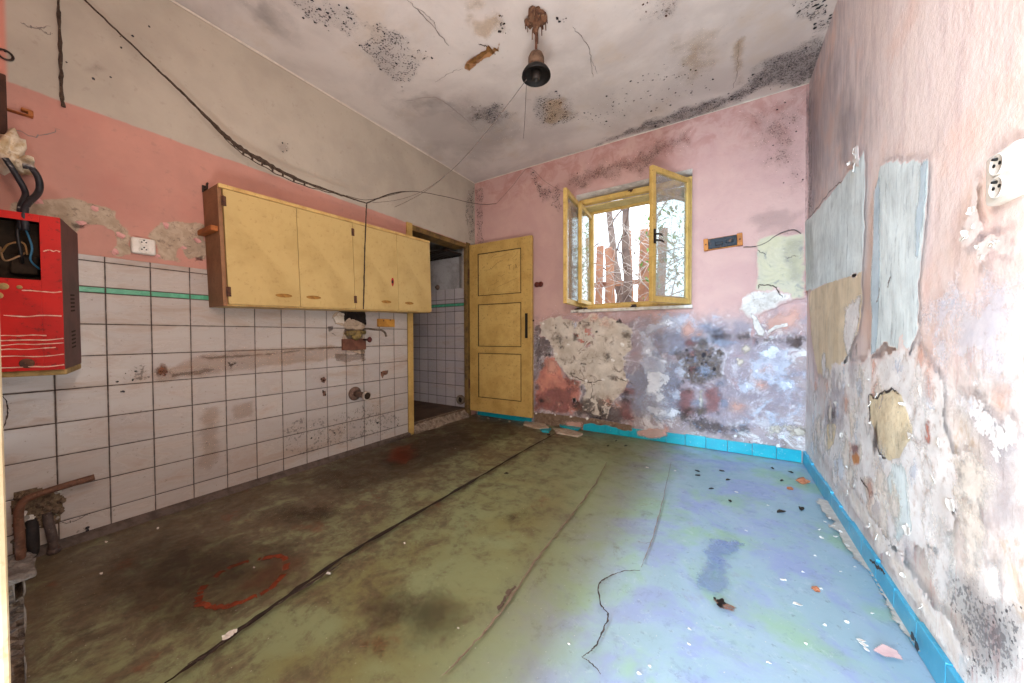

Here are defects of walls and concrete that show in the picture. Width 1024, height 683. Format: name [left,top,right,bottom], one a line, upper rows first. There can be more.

leakage [293,0,433,87]
leakage [531,0,832,218]
peeling [9,196,132,257]
peeling [147,221,206,263]
peeling [328,311,366,354]
peeling [534,313,666,438]
leakage [533,319,801,432]
peeling [738,286,793,336]
peeling [811,334,1000,600]
crack [582,464,671,674]
peeling [816,498,920,651]
leakage [947,573,1024,681]